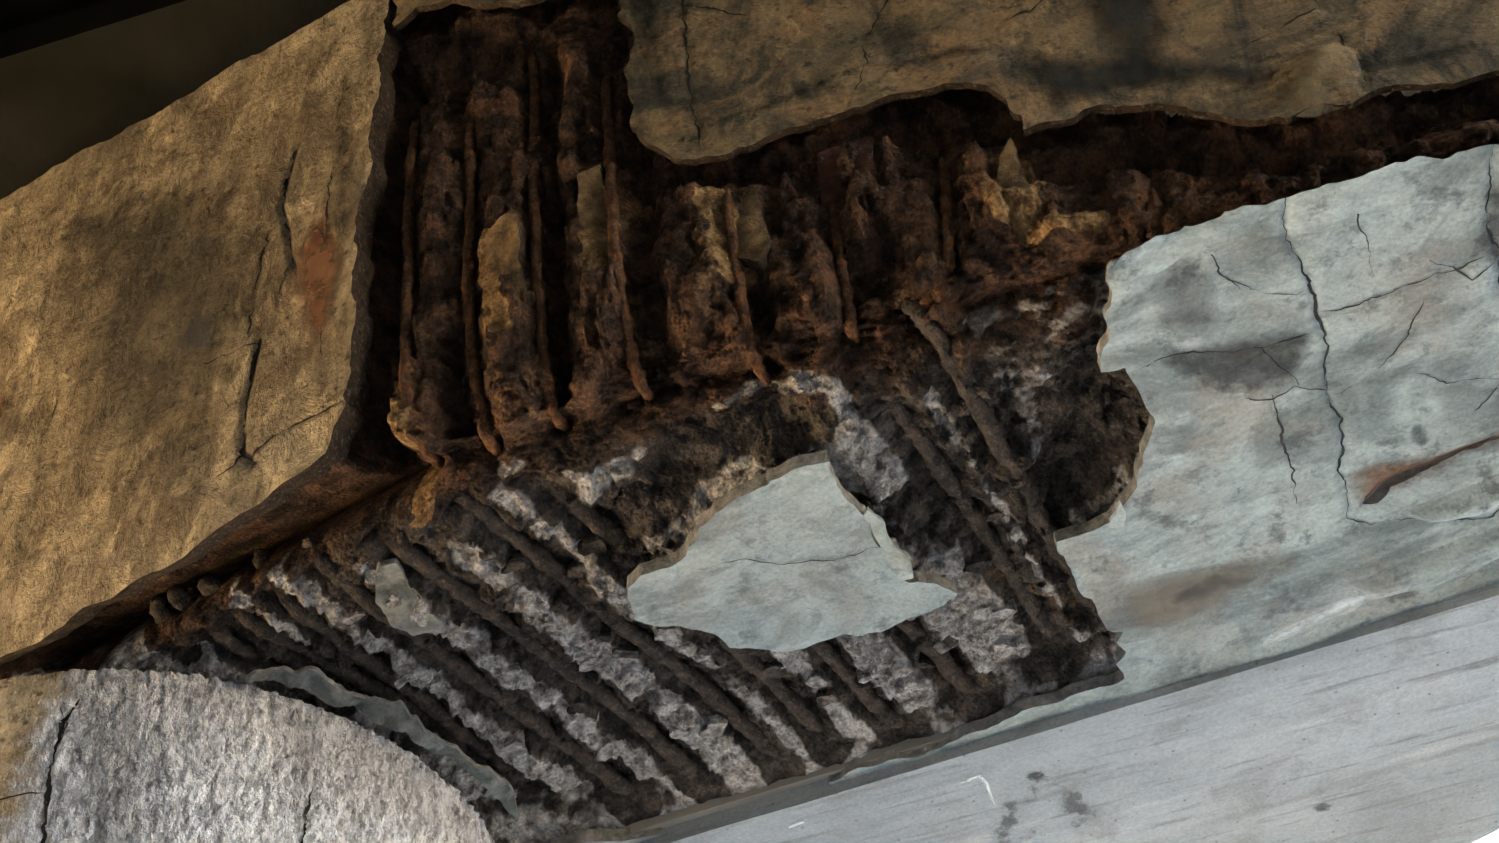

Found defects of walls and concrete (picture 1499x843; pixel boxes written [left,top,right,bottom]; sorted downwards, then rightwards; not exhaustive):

crack [1233,0,1368,87]
crack [211,143,345,478]
spalling [0,0,1150,843]
crack [1146,351,1211,367]
spalling [953,76,1499,311]
crack [1211,145,1499,525]
crack [0,699,80,843]